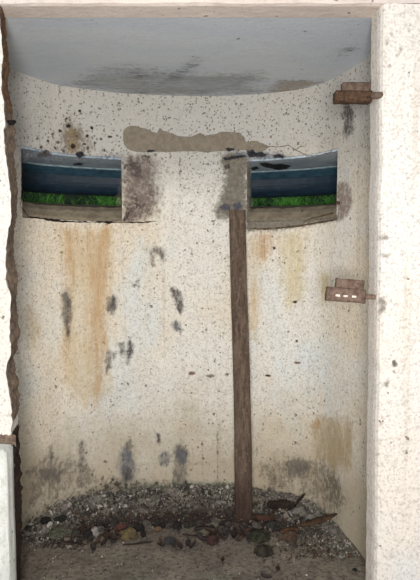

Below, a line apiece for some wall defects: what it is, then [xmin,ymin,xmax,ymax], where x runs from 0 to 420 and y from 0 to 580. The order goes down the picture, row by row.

leakage [271,80,313,93]
leakage [341,105,354,135]
spalling [117,126,352,231]
leakage [62,292,72,334]
leakage [171,288,183,313]
leakage [86,443,188,495]